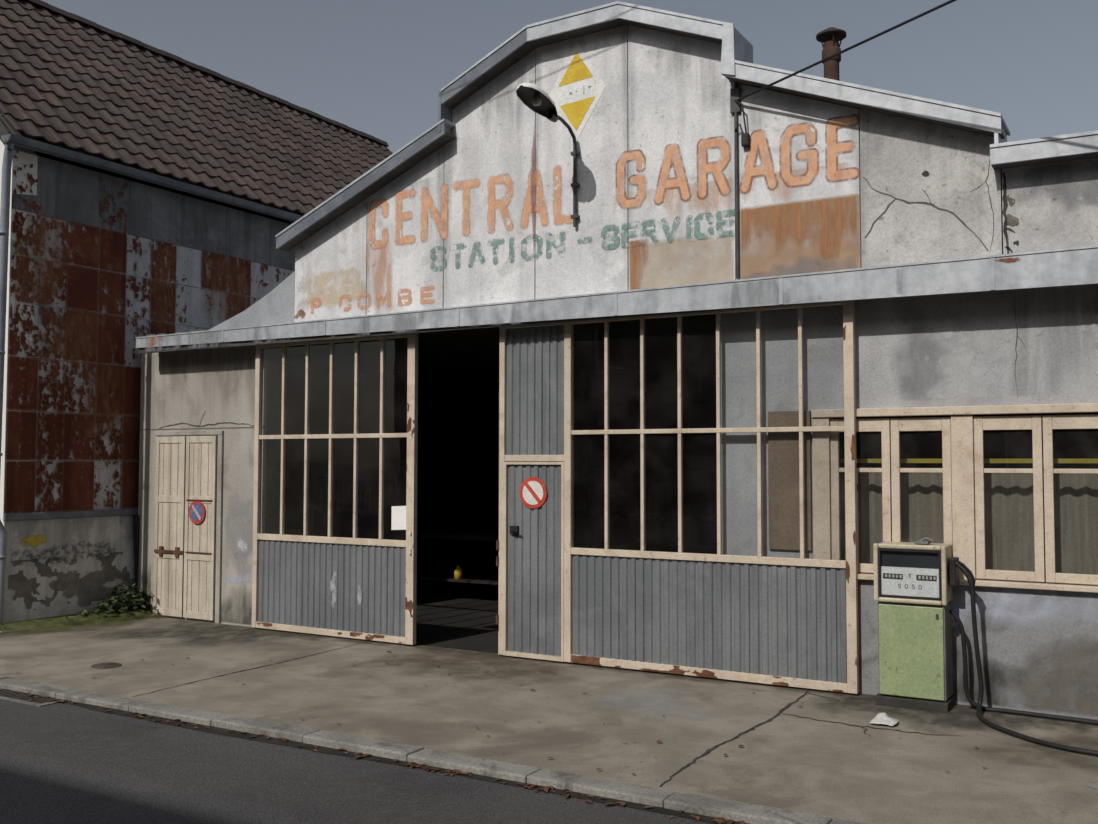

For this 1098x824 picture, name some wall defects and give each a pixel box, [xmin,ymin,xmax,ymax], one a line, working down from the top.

rust [740,195,860,279]
crack [863,161,1015,254]
peeling [8,552,135,610]